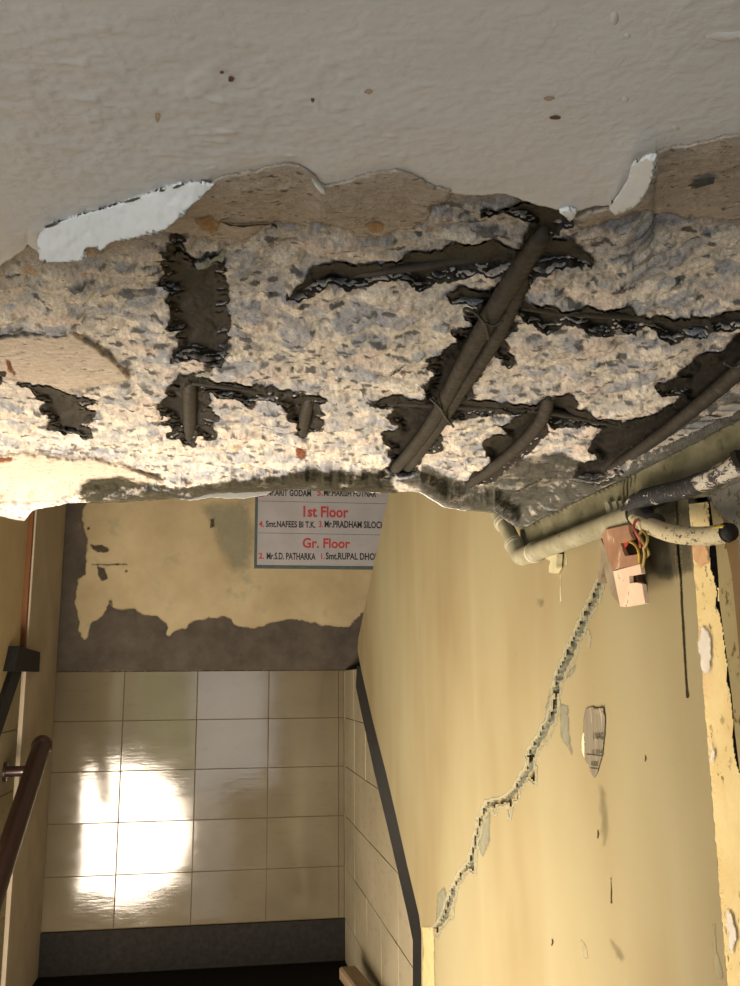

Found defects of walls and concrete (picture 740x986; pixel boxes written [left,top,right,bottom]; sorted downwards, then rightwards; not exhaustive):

spalling [0,133,740,673]
crack [429,577,605,939]
peeling [725,910,736,955]